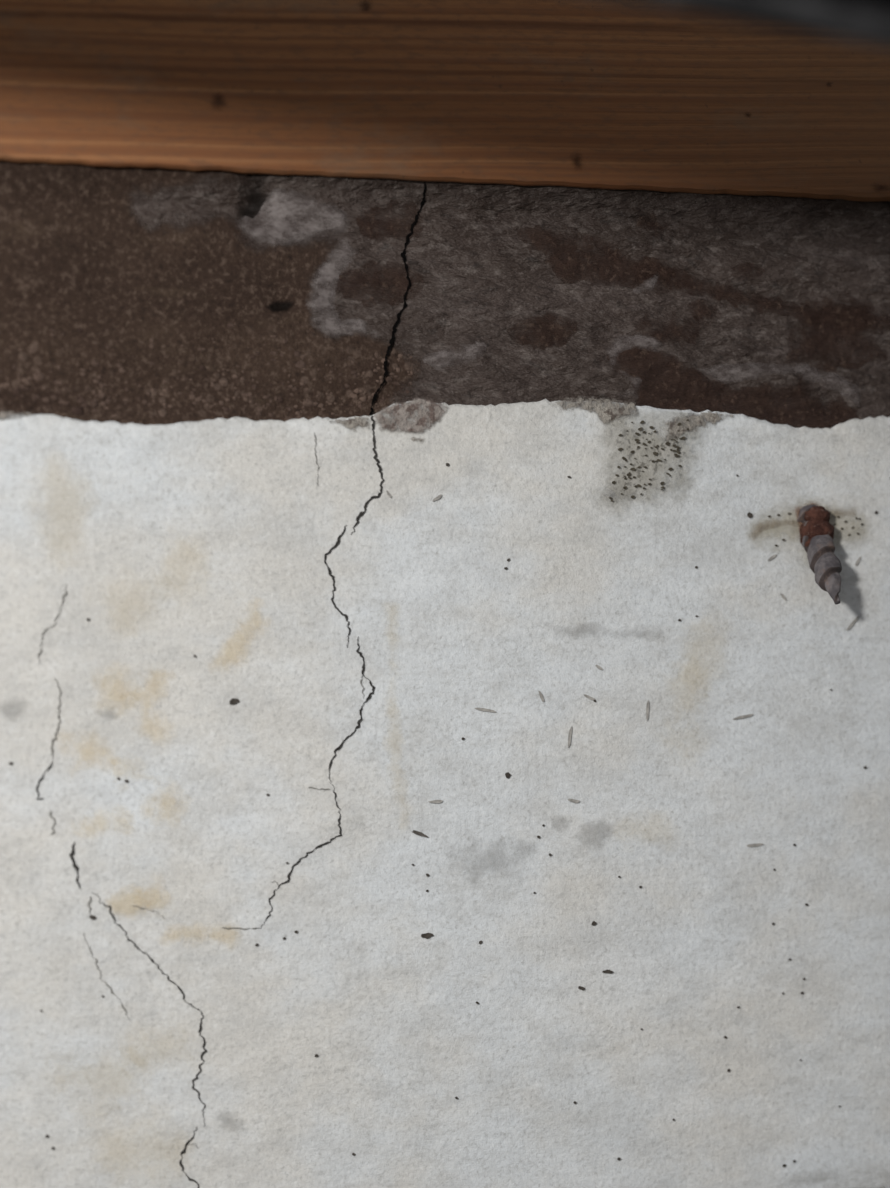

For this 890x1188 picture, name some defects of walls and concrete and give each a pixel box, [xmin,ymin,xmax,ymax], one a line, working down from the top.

crack [223,181,426,930]
peeling [0,173,890,502]
crack [36,584,207,1188]